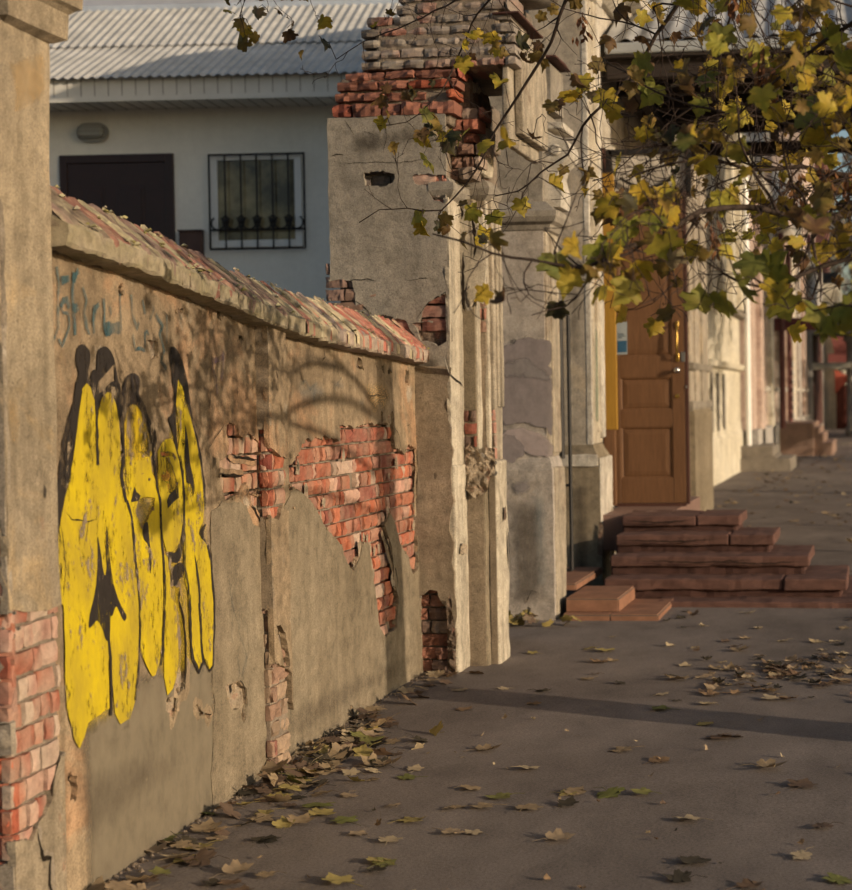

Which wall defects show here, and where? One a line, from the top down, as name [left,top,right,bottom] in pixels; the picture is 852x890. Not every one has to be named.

spalling [413,78,492,185]
spalling [364,170,395,187]
spalling [325,263,376,311]
spalling [380,294,452,346]
spalling [464,410,498,498]
spalling [218,411,419,635]
spalling [419,590,456,673]
spalling [0,583,66,864]
spalling [262,598,292,775]
crack [37,827,56,890]